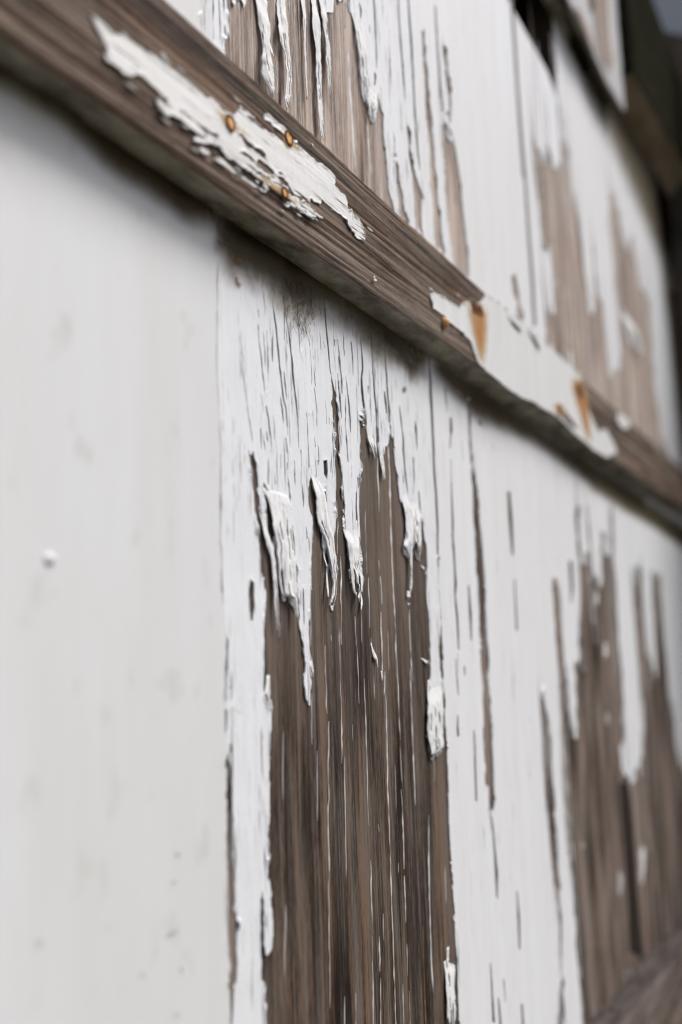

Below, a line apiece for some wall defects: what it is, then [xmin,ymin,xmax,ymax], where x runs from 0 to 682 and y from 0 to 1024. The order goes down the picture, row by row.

rust [221,113,237,132]
peeling [88,0,469,276]
peeling [429,105,668,457]
peeling [225,744,236,1024]
peeling [248,381,459,1024]
peeling [468,406,497,896]
peeling [540,500,682,1024]